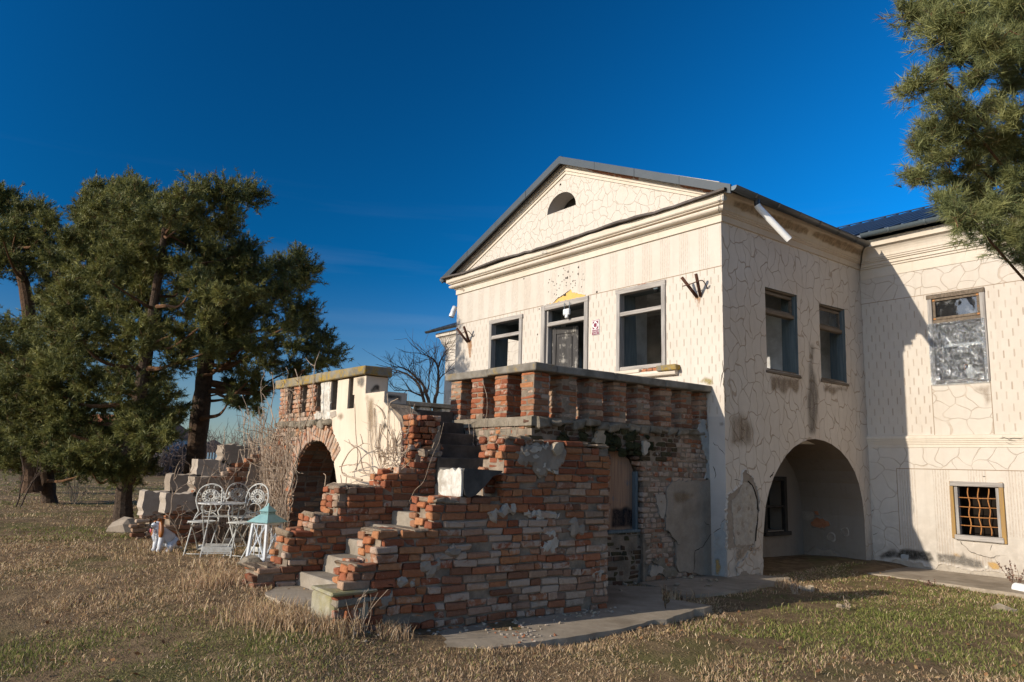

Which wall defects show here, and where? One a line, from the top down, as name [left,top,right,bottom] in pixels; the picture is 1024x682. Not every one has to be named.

water stain [772,371,835,432]
spalling [713,469,760,577]